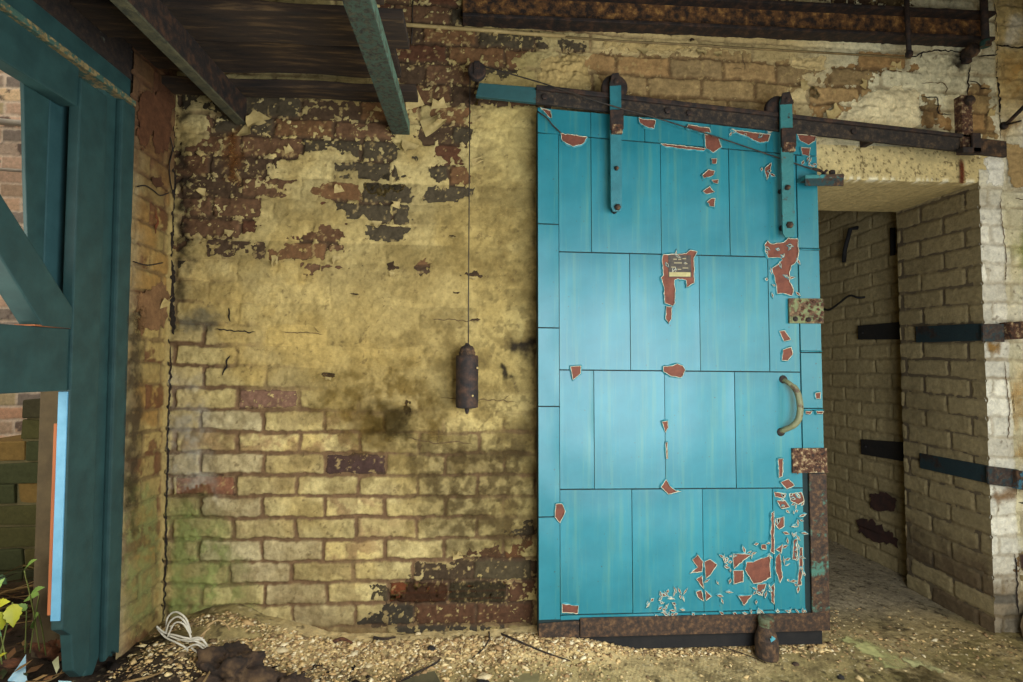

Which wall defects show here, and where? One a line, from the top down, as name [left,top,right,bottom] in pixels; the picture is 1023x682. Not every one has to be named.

crack [912,4,1023,138]
peeling [136,0,919,276]
peeling [917,94,952,131]
peeling [967,83,999,139]
rust [799,299,824,322]
rust [795,448,823,474]
peeling [357,520,537,634]
peeling [1013,552,1023,581]